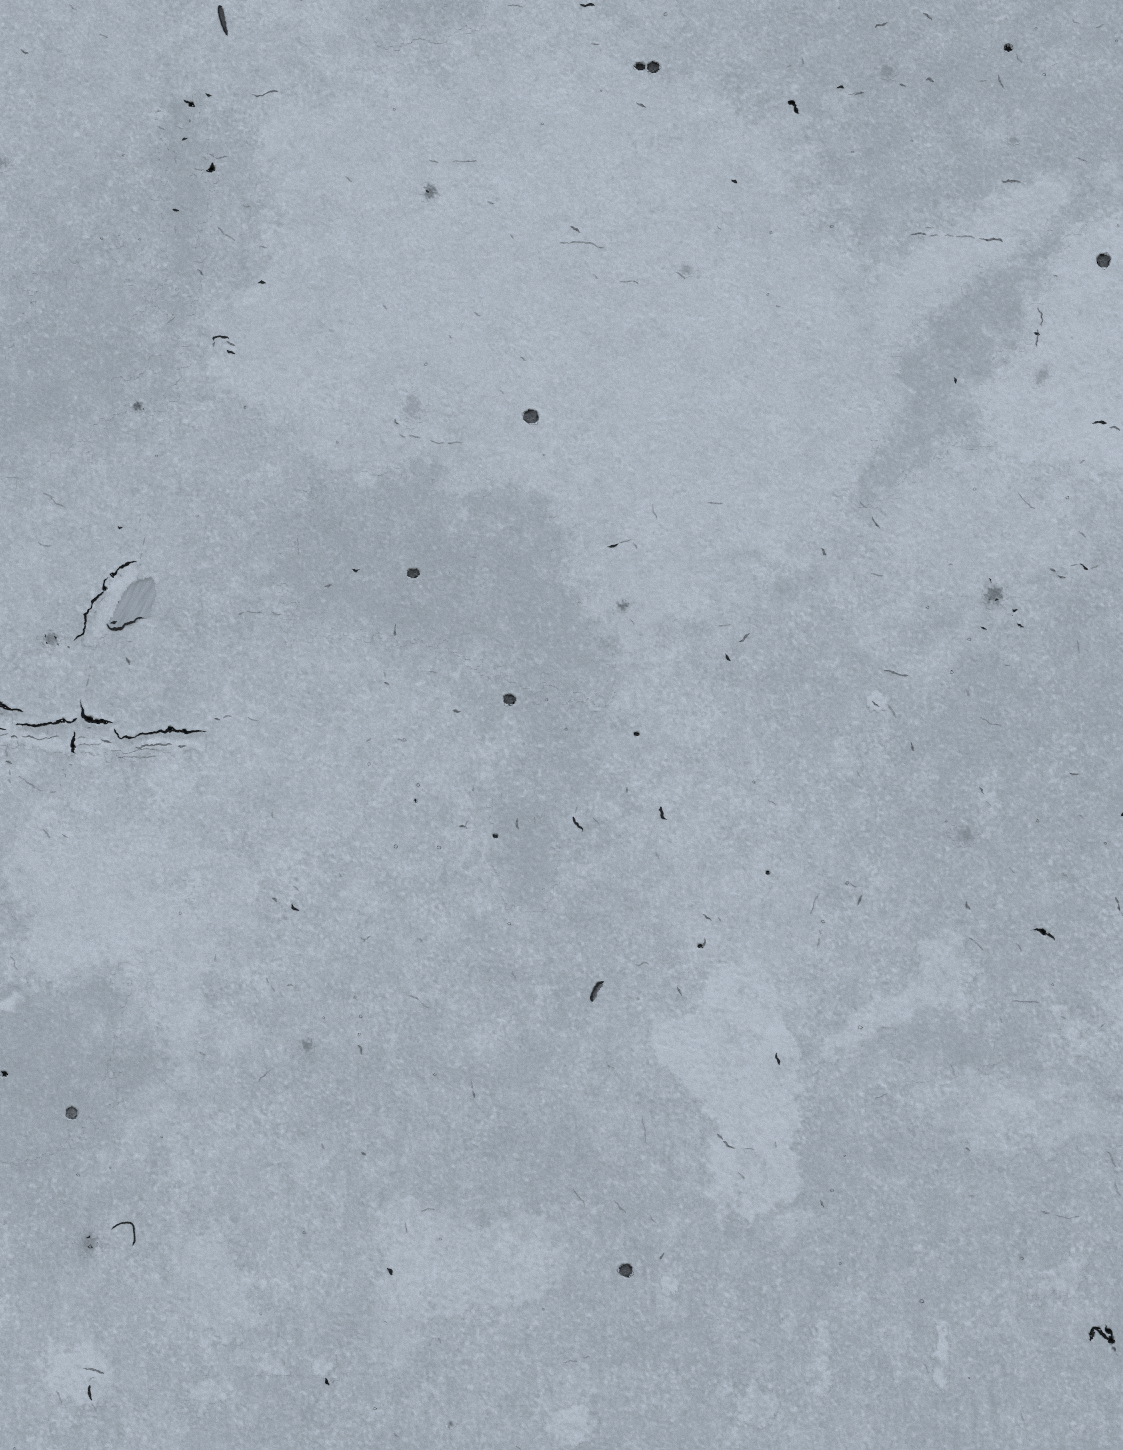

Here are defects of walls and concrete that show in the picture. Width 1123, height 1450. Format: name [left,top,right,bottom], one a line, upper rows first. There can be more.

crack [0,521,258,792]
spalling [106,577,156,631]